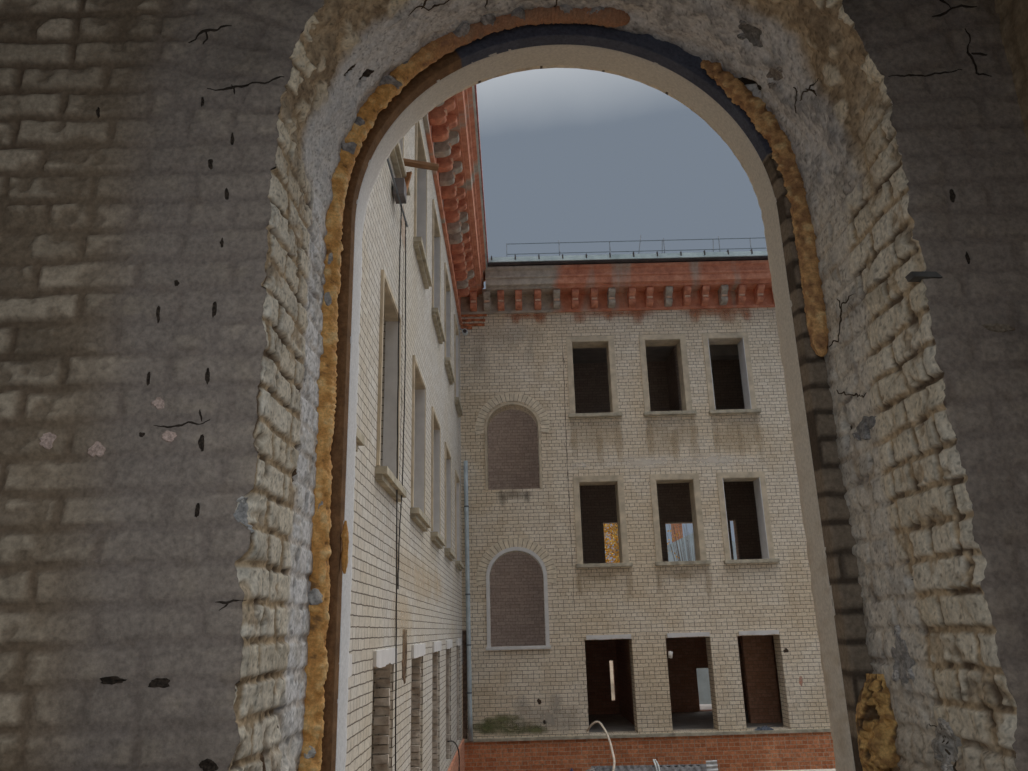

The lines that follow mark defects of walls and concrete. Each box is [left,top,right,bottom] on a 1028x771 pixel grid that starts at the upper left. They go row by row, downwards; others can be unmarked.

crack [408,0,450,16]
crack [188,25,232,44]
spalling [737,20,763,48]
crack [888,0,992,77]
crack [207,76,284,94]